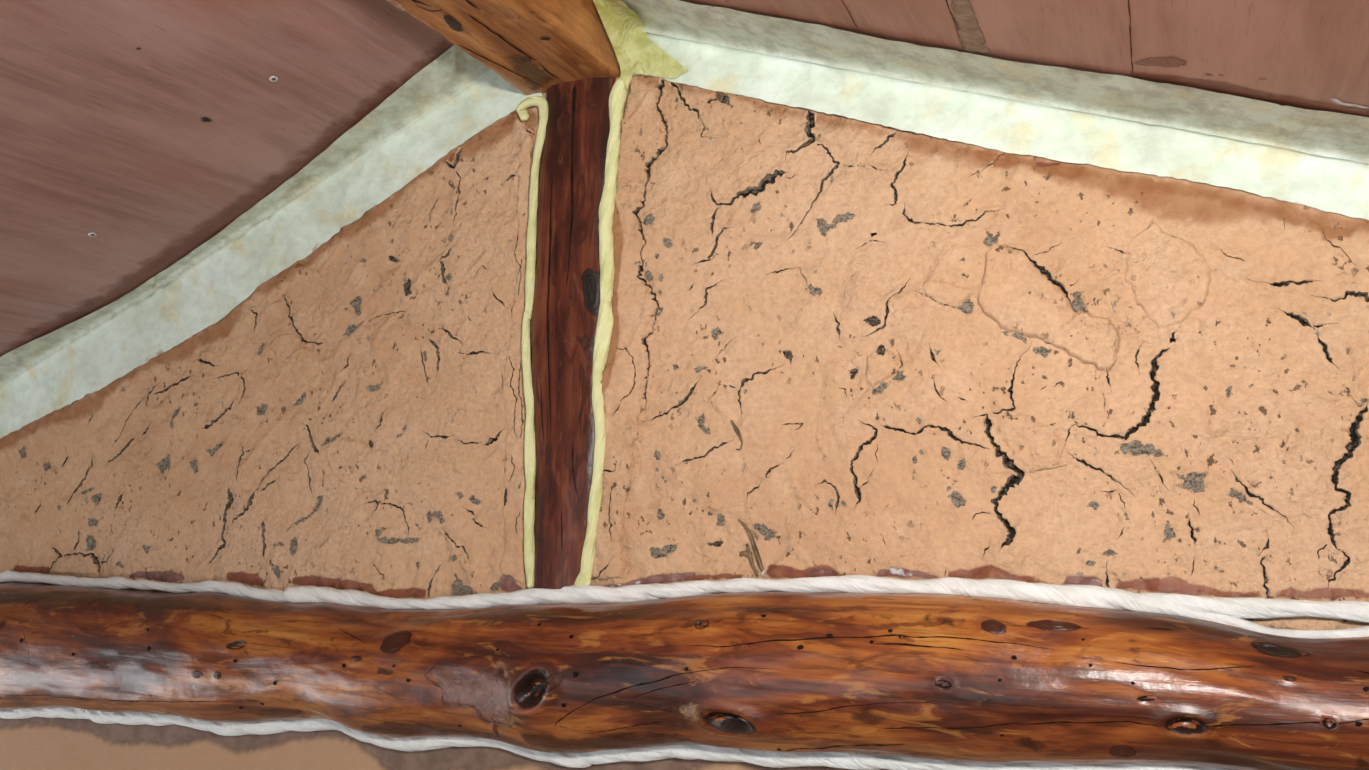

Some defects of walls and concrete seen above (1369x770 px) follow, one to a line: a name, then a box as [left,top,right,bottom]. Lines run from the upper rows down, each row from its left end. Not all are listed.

crack [34,293,352,578]
crack [364,145,524,599]
crack [503,124,537,186]
crack [613,77,1082,468]
crack [742,276,1203,588]
crack [1105,243,1134,258]
crack [1221,231,1369,599]